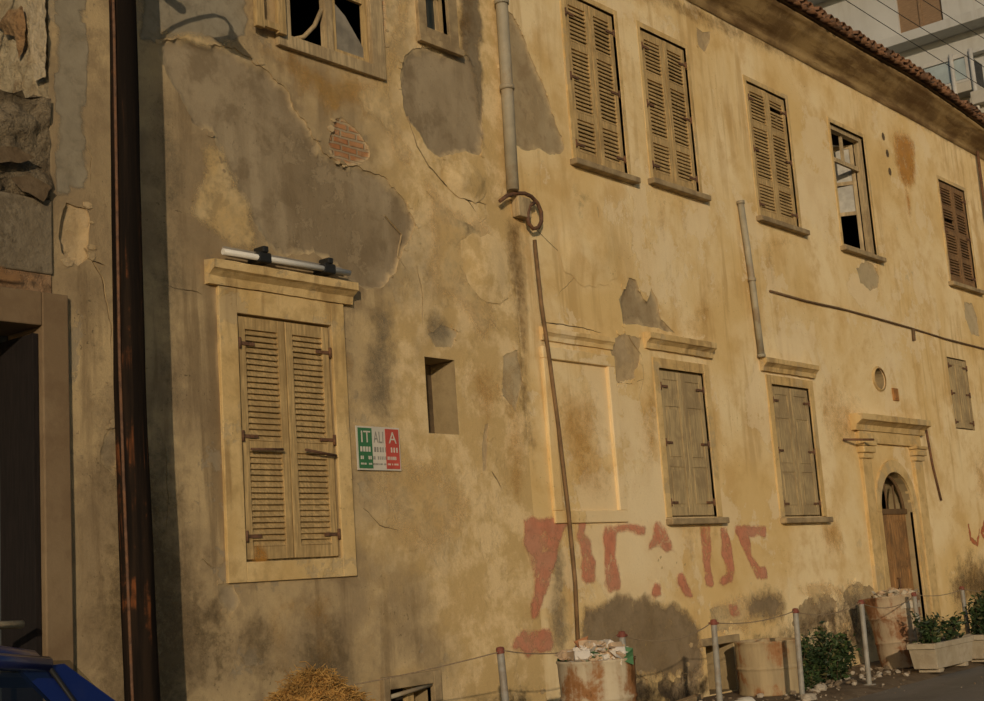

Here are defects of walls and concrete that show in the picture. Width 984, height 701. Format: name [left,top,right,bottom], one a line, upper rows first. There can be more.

peeling [0,146,34,163]
peeling [29,0,47,81]
flaking render [155,34,421,290]
flaking render [397,45,485,160]
flaking render [508,12,564,155]
flaking render [609,278,673,387]
leakage [637,678,707,701]